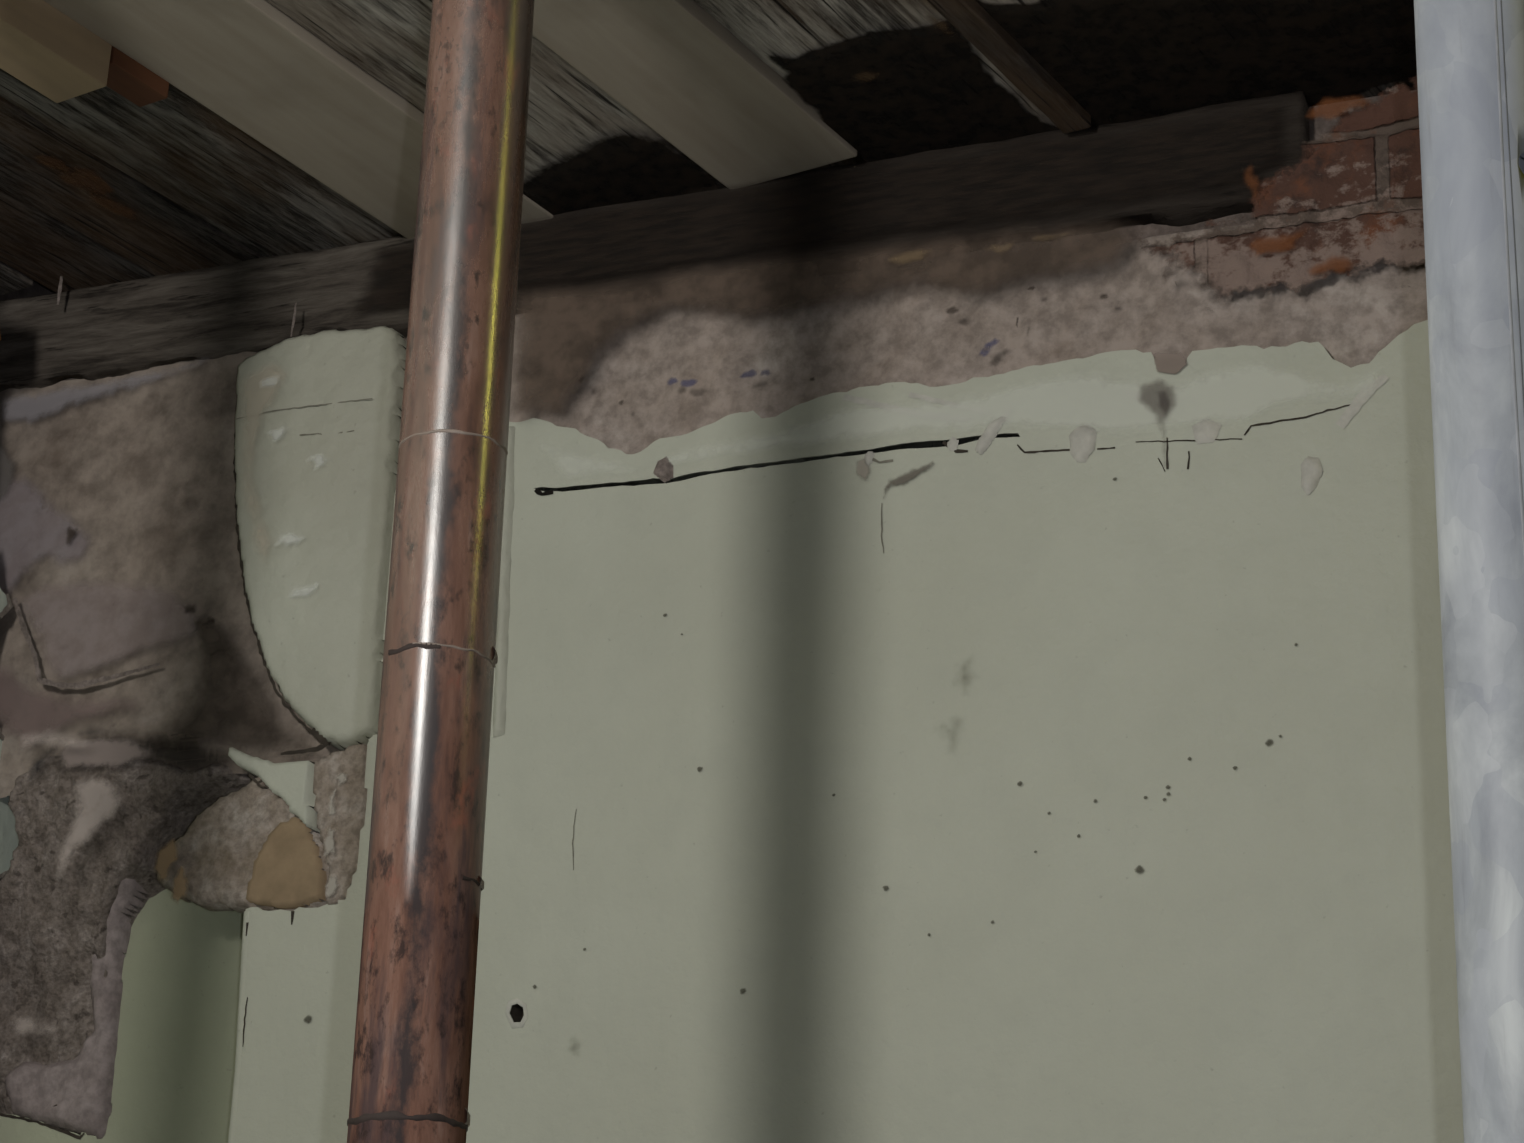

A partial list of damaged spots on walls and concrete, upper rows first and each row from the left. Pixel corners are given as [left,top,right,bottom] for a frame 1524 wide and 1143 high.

leakage [359,245,414,311]
crack [534,404,1350,496]
leakage [514,0,1417,411]
spalling [509,76,1428,483]
leakage [1142,383,1172,417]
spalling [0,352,367,1139]